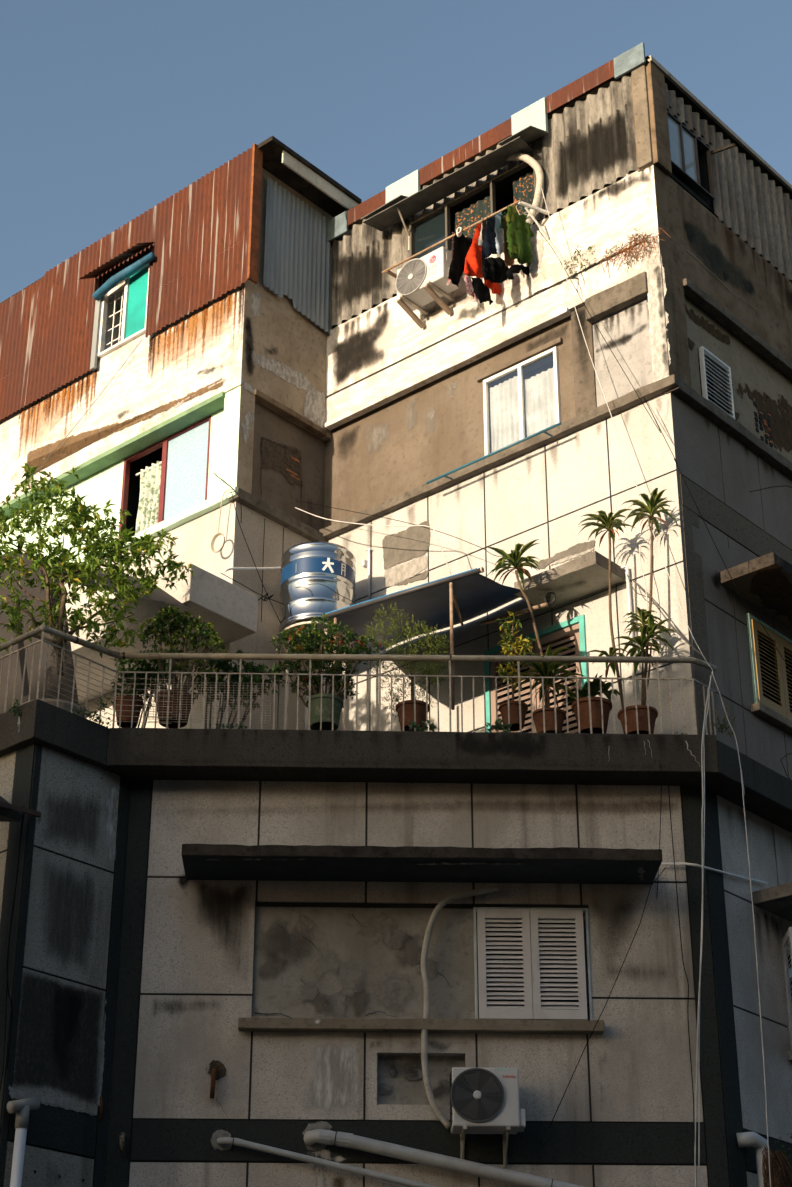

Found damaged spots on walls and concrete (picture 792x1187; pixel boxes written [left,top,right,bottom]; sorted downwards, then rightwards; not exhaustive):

damp [557,104,650,204]
damp [332,235,389,311]
rust [148,286,244,371]
damp [242,293,326,430]
damp [336,303,388,383]
peeling [685,304,730,344]
rust [19,369,97,445]
peeling [732,383,792,452]
spalling [261,438,303,486]
damp [49,787,118,858]
damp [13,974,101,1101]